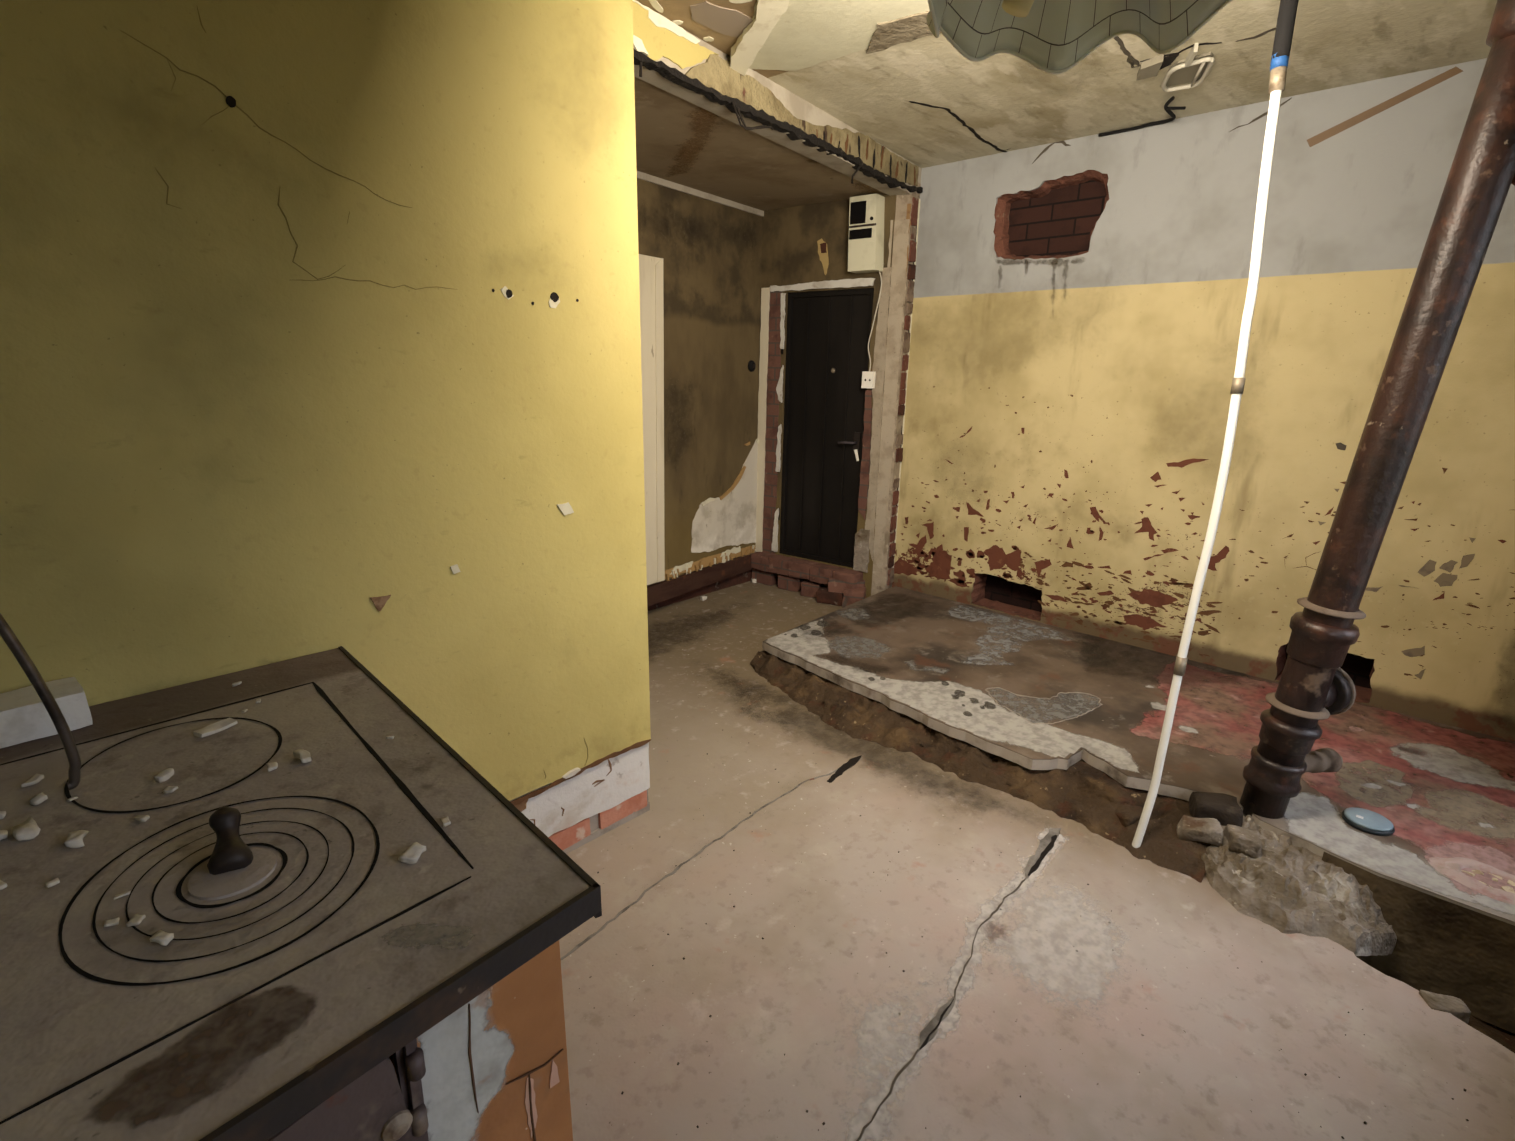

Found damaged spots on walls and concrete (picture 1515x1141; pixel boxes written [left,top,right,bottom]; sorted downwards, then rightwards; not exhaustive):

crack [1114,27,1276,70]
crack [120,30,412,223]
crack [909,101,1071,164]
crack [1229,97,1292,132]
crack [277,189,457,290]
spalling [492,286,514,300]
spalling [531,292,579,308]
peeling [632,0,1294,760]
peeling [1357,501,1515,679]
spalling [510,739,651,854]
peeling [1301,702,1515,902]
spalling [1201,815,1397,956]